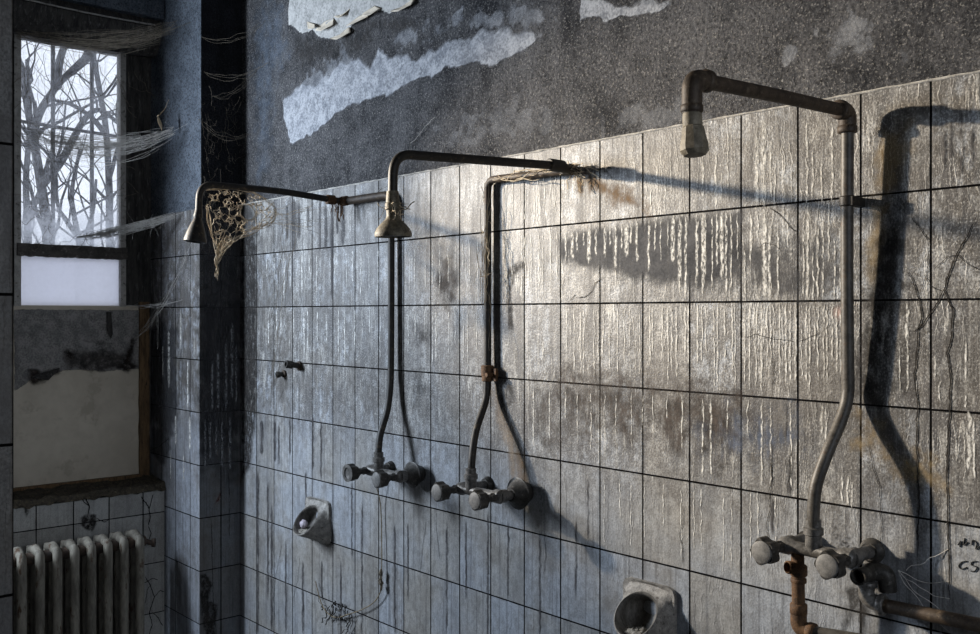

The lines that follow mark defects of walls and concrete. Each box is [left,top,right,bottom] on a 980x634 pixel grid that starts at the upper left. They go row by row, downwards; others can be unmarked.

peeling [283,0,535,143]
corrosion [578,177,634,203]
peeling [13,309,139,390]
leakage [151,201,381,630]
leakage [505,124,841,540]
crack [905,214,979,596]
leakage [394,525,409,628]